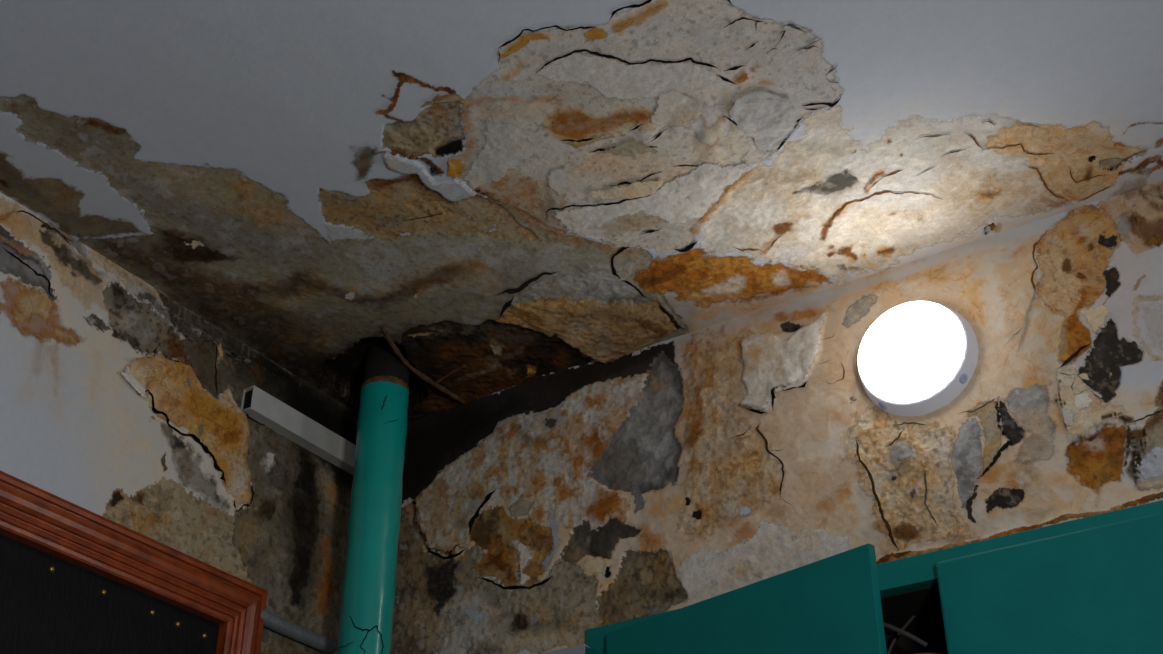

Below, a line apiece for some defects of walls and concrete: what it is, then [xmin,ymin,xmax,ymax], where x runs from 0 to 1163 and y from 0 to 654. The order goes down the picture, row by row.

rust [0,278,80,346]
leakage [0,153,359,654]
flaking render [103,354,256,584]
crack [130,384,254,512]
flaking render [0,0,1066,414]
crack [545,124,699,223]
flaking render [413,351,853,626]
crack [498,0,842,151]
rust [634,249,831,308]
crack [831,121,1115,221]
flaking render [841,267,1143,550]
rust [1035,139,1163,365]